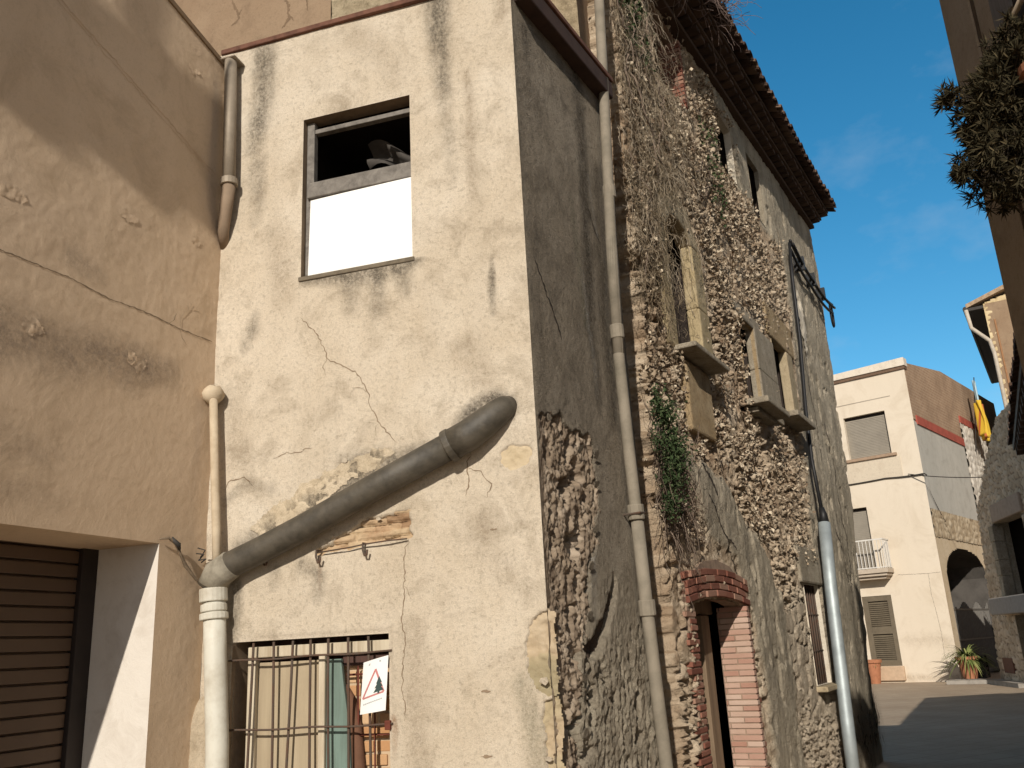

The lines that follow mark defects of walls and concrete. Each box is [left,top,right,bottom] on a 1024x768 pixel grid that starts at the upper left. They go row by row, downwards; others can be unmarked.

water stain [430,0,446,74]
crack [0,249,212,342]
crack [535,260,562,340]
crack [300,317,394,440]
peeling [250,447,395,535]
peeling [317,509,413,556]
crack [401,539,410,721]
flaking render [527,411,611,768]